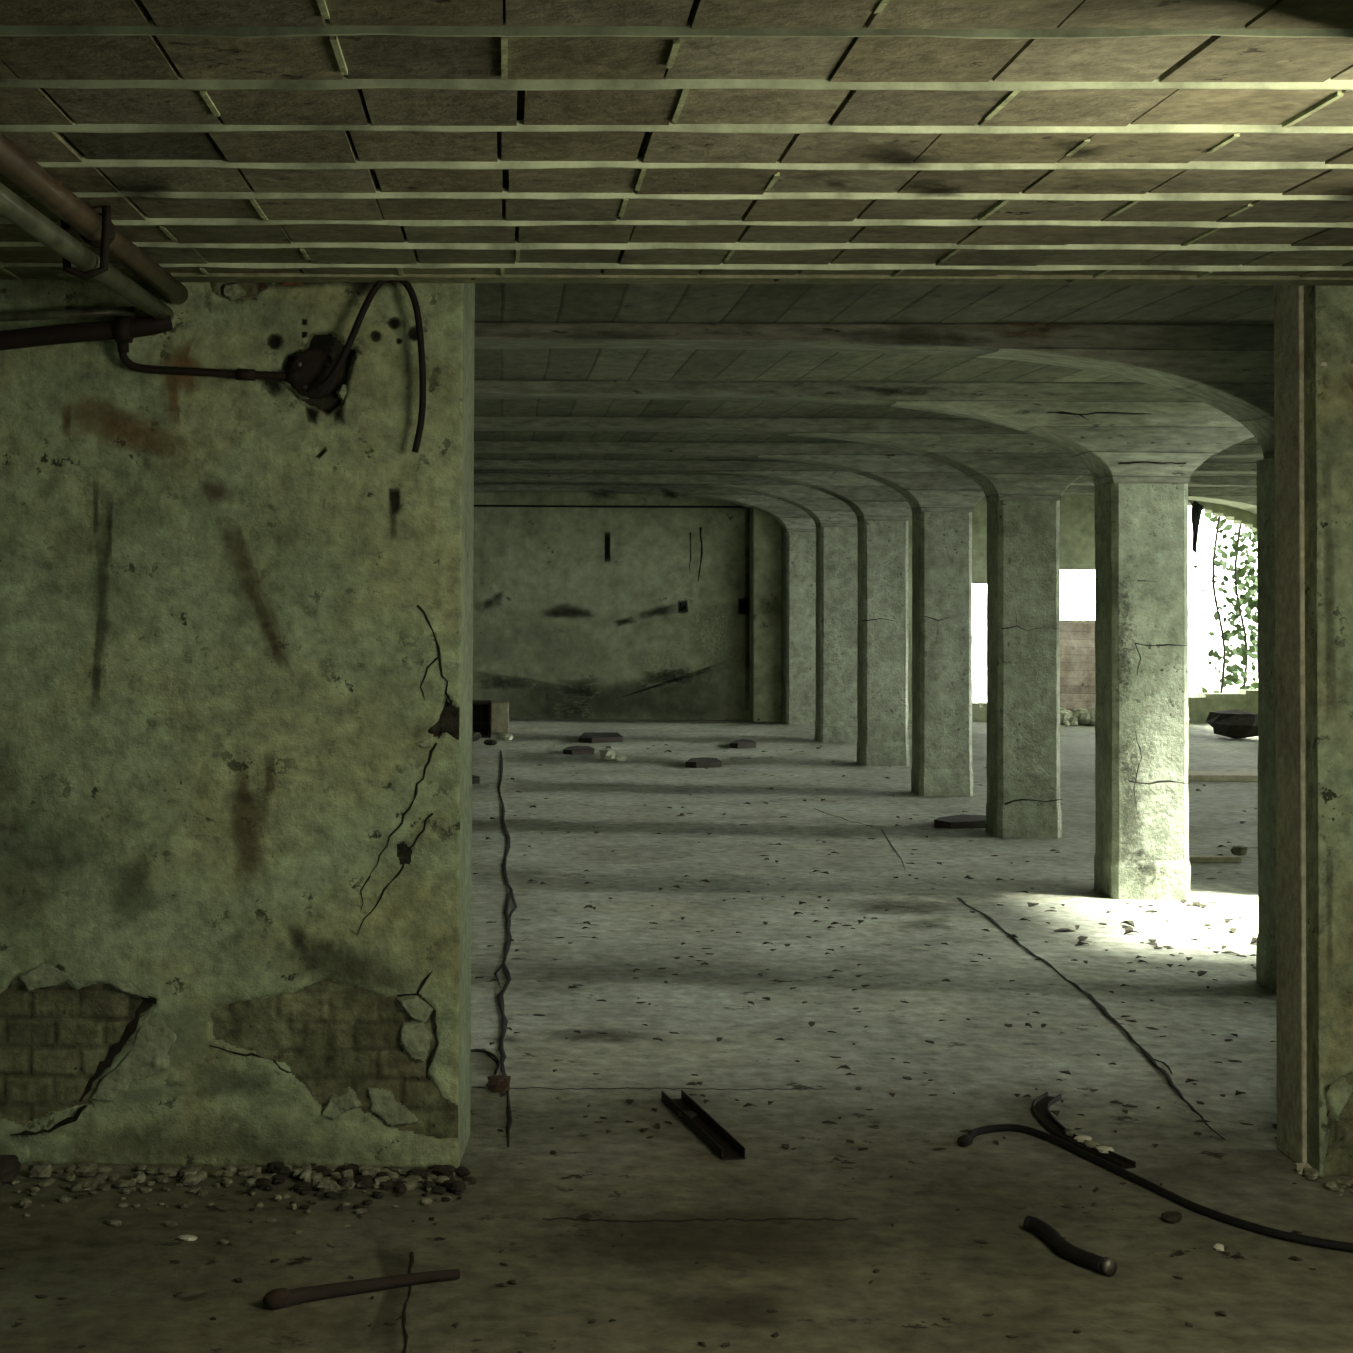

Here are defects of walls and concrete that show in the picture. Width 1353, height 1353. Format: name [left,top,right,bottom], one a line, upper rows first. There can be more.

water stain [94,493,111,647]
crack [354,605,453,936]
crack [813,808,905,869]
spalling [0,963,176,1127]
spalling [210,981,458,1139]
crack [397,750,825,1147]
crack [957,897,1226,1141]
spalling [1325,1073,1353,1177]